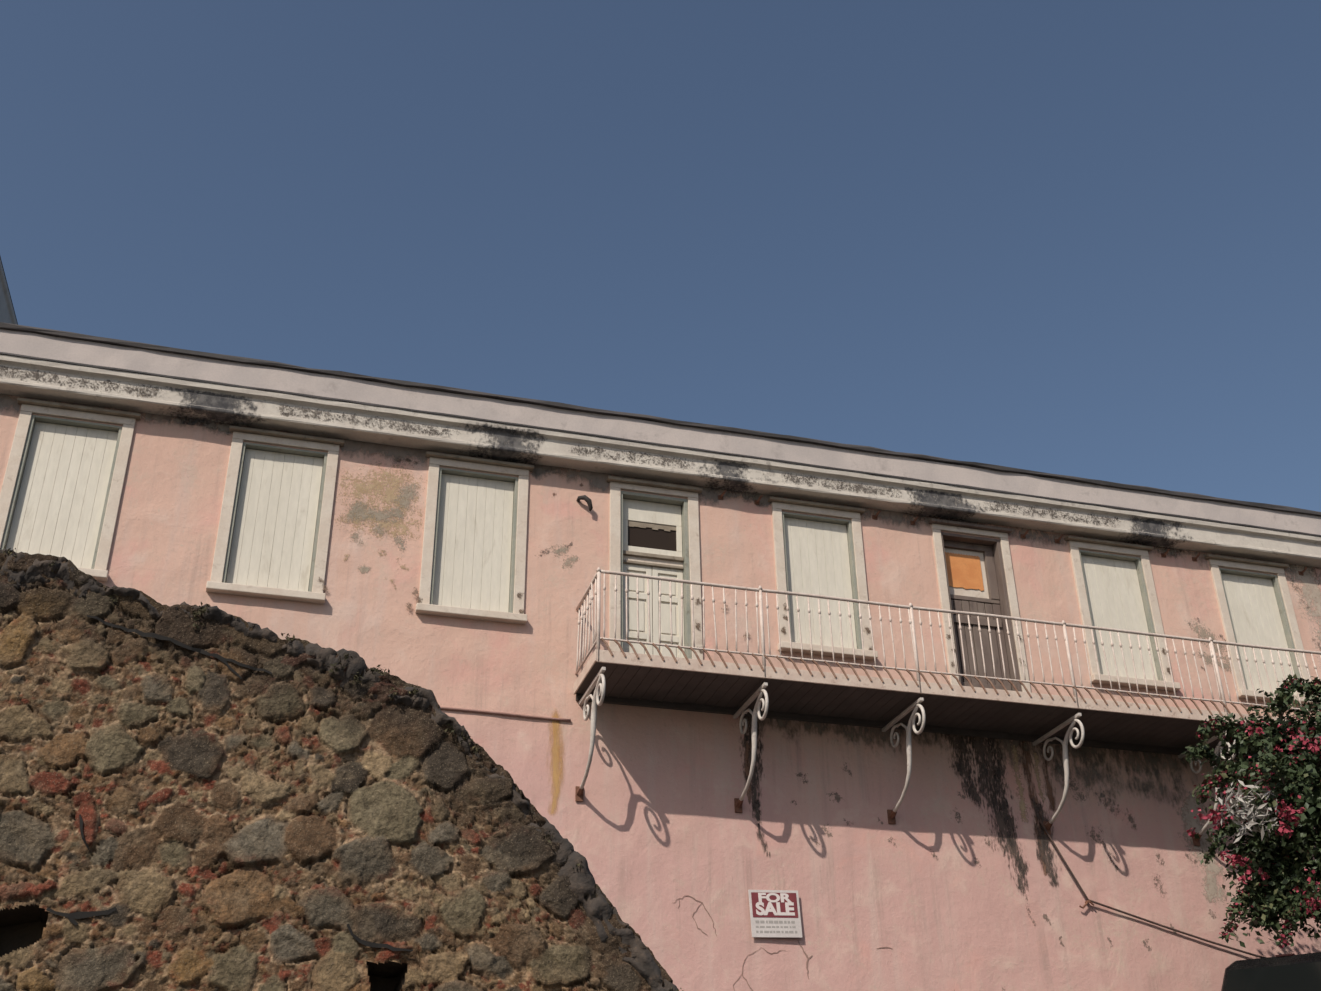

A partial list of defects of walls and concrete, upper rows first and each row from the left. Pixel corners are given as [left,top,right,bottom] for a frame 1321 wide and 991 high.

spalling [335,458,422,589]
damp [0,366,1318,571]
damp [743,716,1188,926]
crack [674,895,717,936]
crack [733,941,812,991]